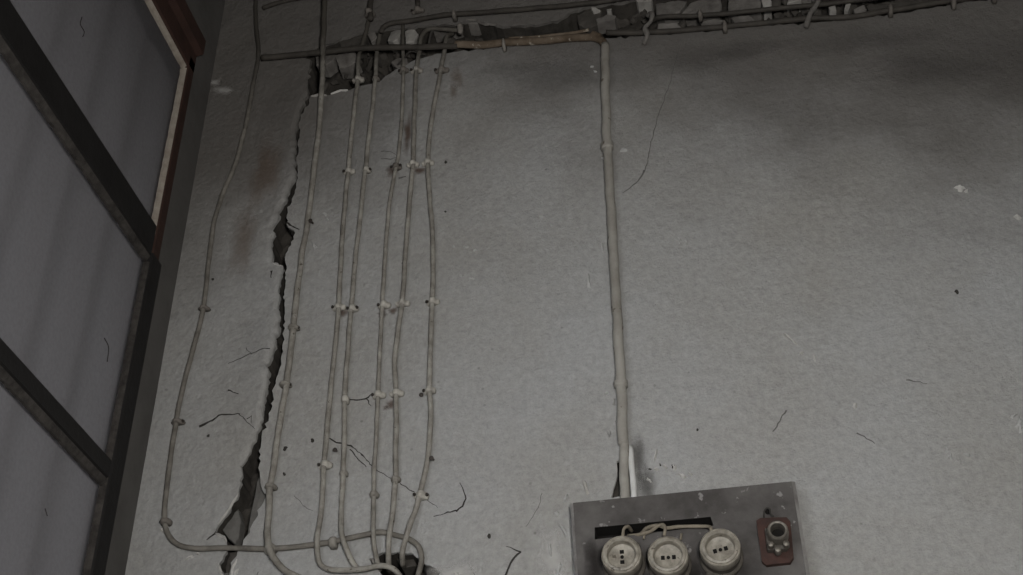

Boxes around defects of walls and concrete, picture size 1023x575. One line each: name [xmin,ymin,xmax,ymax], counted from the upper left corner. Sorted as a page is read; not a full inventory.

spalling [303,0,962,97]
crack [199,60,319,575]